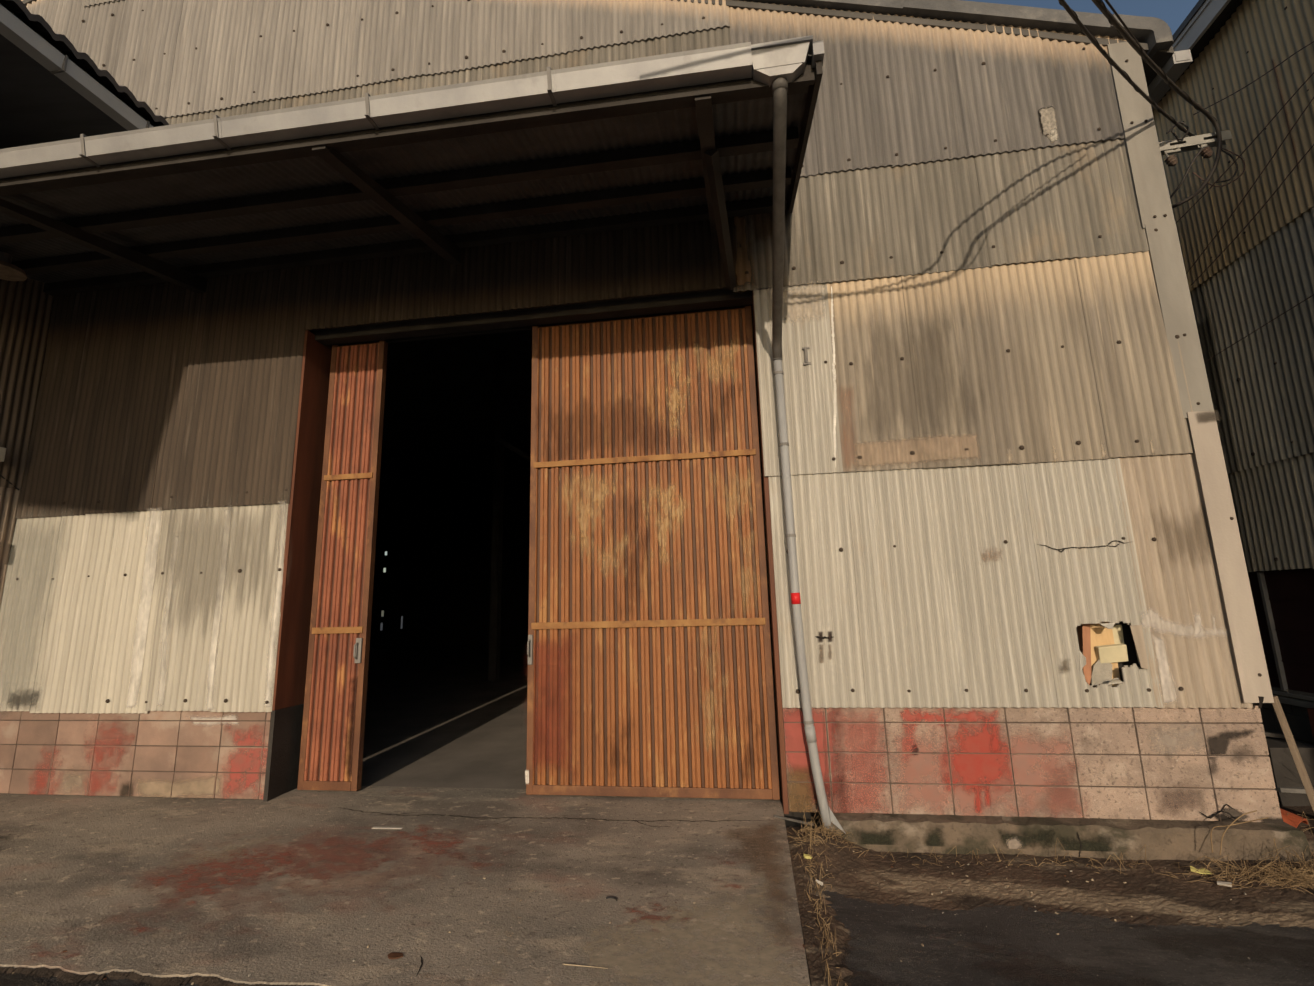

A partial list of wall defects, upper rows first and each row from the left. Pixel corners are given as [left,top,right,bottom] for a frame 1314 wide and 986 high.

peeling [1076,610,1222,702]
rust [347,679,358,775]